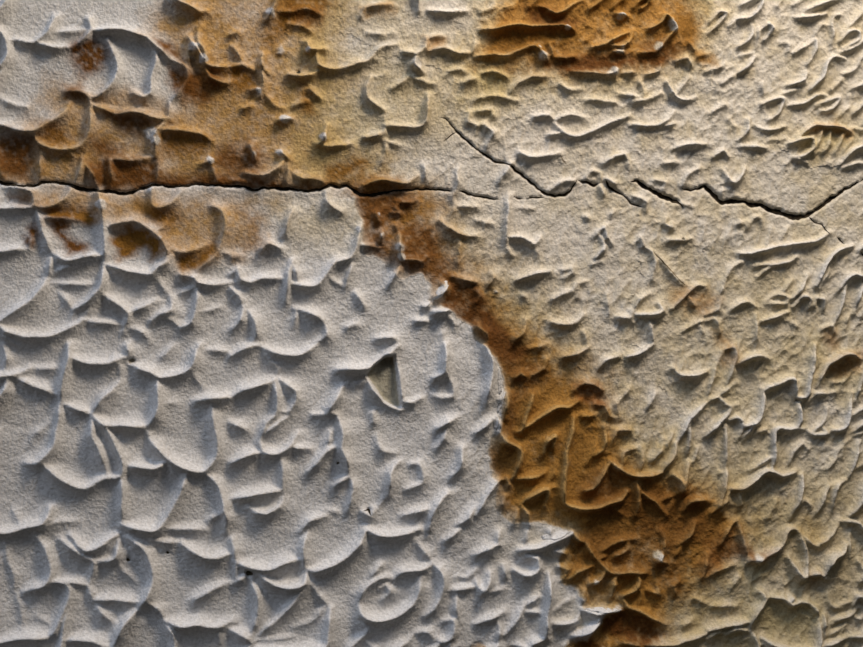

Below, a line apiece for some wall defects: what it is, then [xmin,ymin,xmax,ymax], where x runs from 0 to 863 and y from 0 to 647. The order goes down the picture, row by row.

leakage [336,0,466,73]
crack [0,117,863,255]